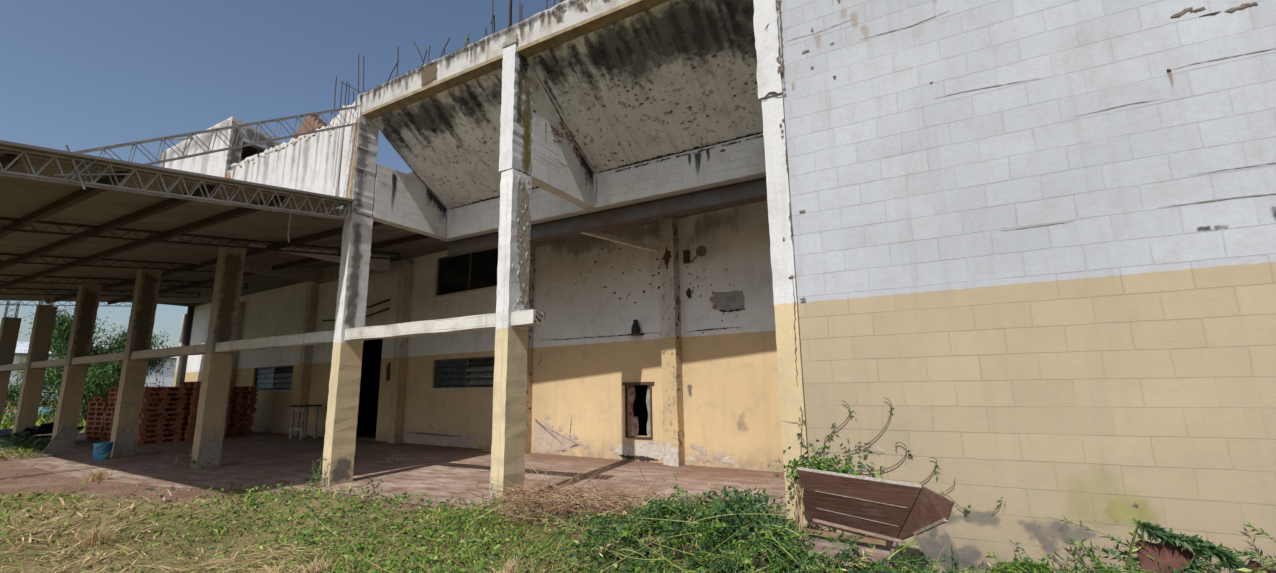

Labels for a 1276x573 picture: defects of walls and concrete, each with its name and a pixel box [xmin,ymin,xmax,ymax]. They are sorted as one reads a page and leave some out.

spalling [1170,6,1206,18]
damp [359,0,577,151]
damp [517,0,763,172]
crack [938,78,1039,98]
crack [1171,48,1276,70]
crack [1078,99,1160,116]
damp [426,187,447,216]
damp [576,147,594,185]
crack [1158,162,1276,208]
flaking render [601,224,746,355]
peeling [512,176,590,454]
peeling [609,432,740,469]